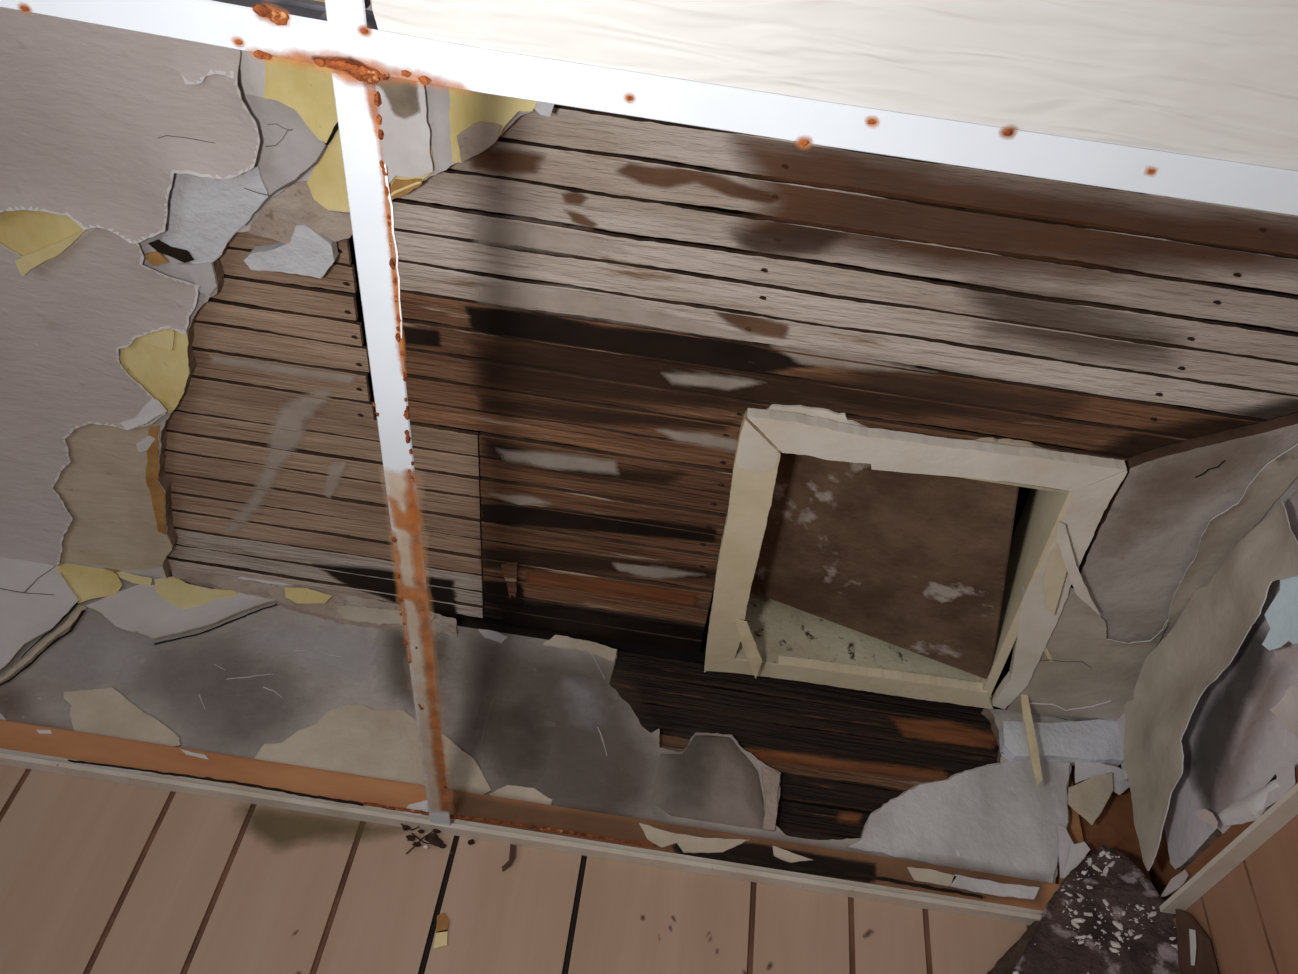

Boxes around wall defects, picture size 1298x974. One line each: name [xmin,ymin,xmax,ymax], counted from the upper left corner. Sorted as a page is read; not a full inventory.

corrosion [252,4,289,26]
corrosion [233,39,460,140]
peeling [376,77,419,118]
water stain [619,142,1298,267]
flaking render [0,45,405,670]
corrosion [379,160,407,382]
water stain [466,308,1062,429]
water stain [985,294,1159,349]
flaking render [388,102,1298,863]
corrosion [68,398,654,847]
water stain [483,549,713,653]
flaking render [1067,765,1151,881]